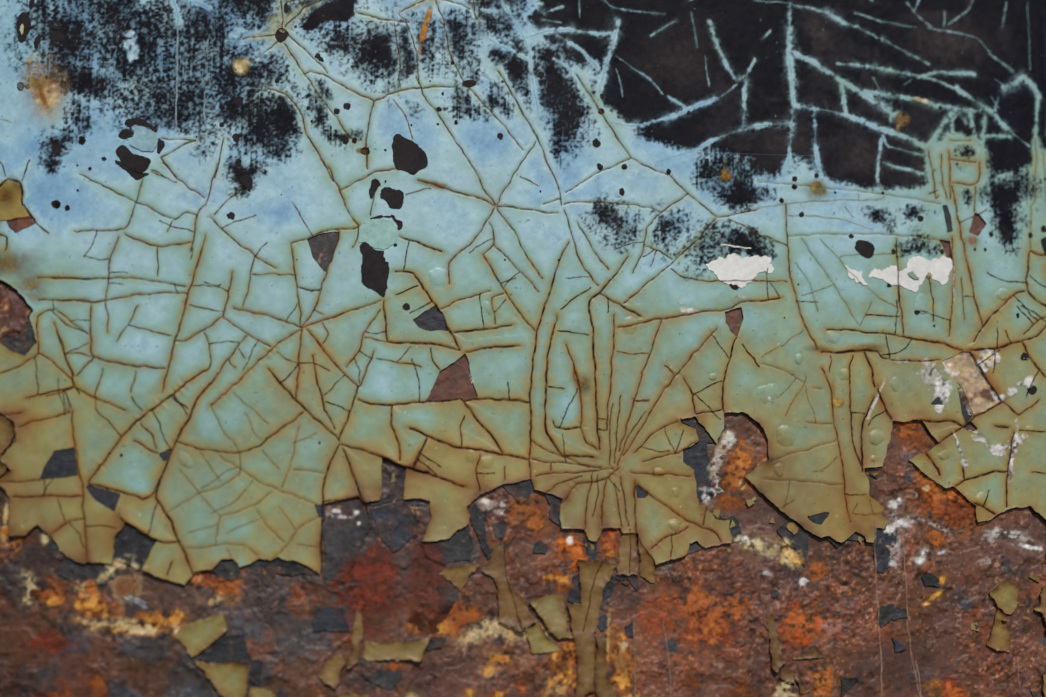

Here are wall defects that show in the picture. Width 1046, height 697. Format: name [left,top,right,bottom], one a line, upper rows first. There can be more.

peeling [384,134,428,175]
water stain [8,0,1046,271]
peeling [369,179,404,230]
rust [0,255,39,338]
peeling [360,242,397,297]
crack [0,0,961,574]
crack [916,151,1046,443]
crack [956,426,1045,514]
peeling [0,412,1046,697]
rust [543,531,588,592]
rust [34,575,185,636]
rust [640,586,747,647]